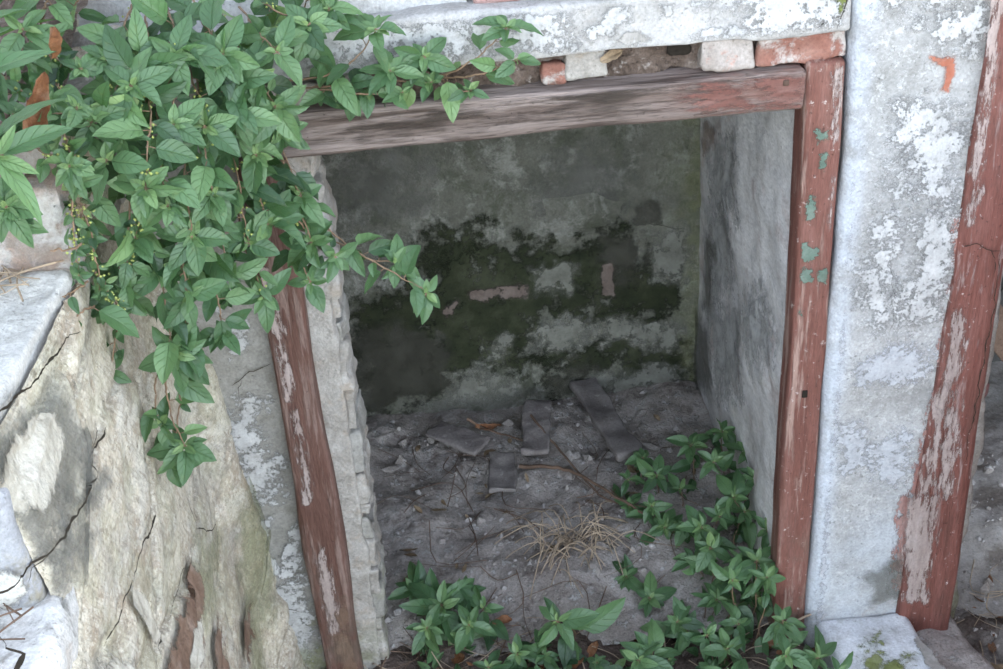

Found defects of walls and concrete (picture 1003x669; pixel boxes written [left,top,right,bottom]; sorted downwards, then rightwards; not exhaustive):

flaking render [443,262,578,318]
damp [349,155,715,415]
flaking render [600,263,616,297]
peeling [830,0,1003,605]
crack [0,331,81,412]
crack [0,423,106,594]
crack [0,637,26,669]
crack [104,515,156,646]
damp [132,587,161,643]
damp [190,621,205,669]